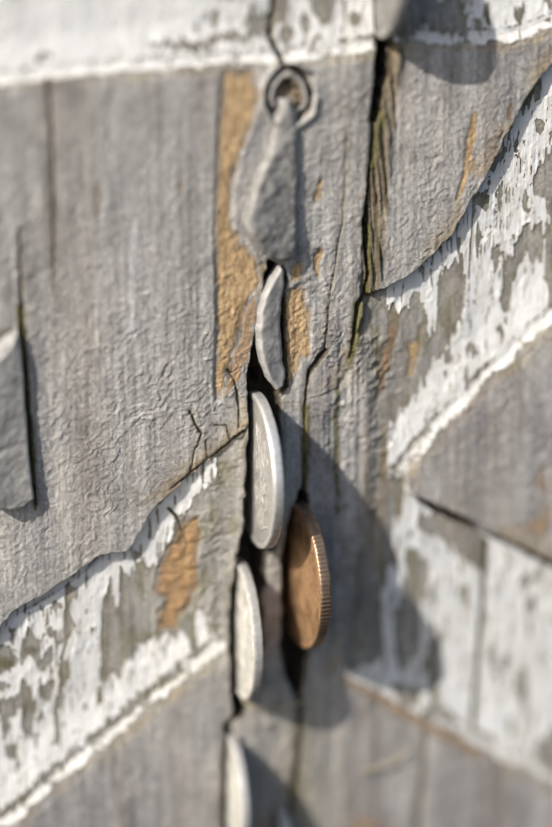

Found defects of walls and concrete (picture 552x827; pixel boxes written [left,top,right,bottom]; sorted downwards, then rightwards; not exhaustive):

peeling [393,0,552,46]
peeling [0,0,376,395]
crack [342,35,391,303]
crack [23,555,103,612]
peeling [0,457,228,826]
crack [223,640,250,732]
crack [172,253,337,488]
crack [235,515,308,819]
crack [296,458,308,505]
peeling [340,65,552,781]